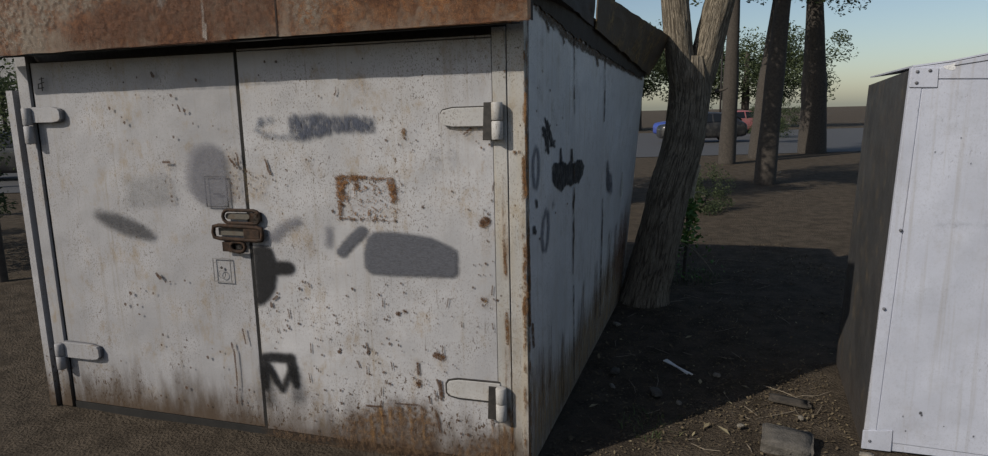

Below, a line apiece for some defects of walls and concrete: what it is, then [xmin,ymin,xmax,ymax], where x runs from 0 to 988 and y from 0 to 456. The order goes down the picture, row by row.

rust [331,173,399,222]
rust [492,37,624,456]